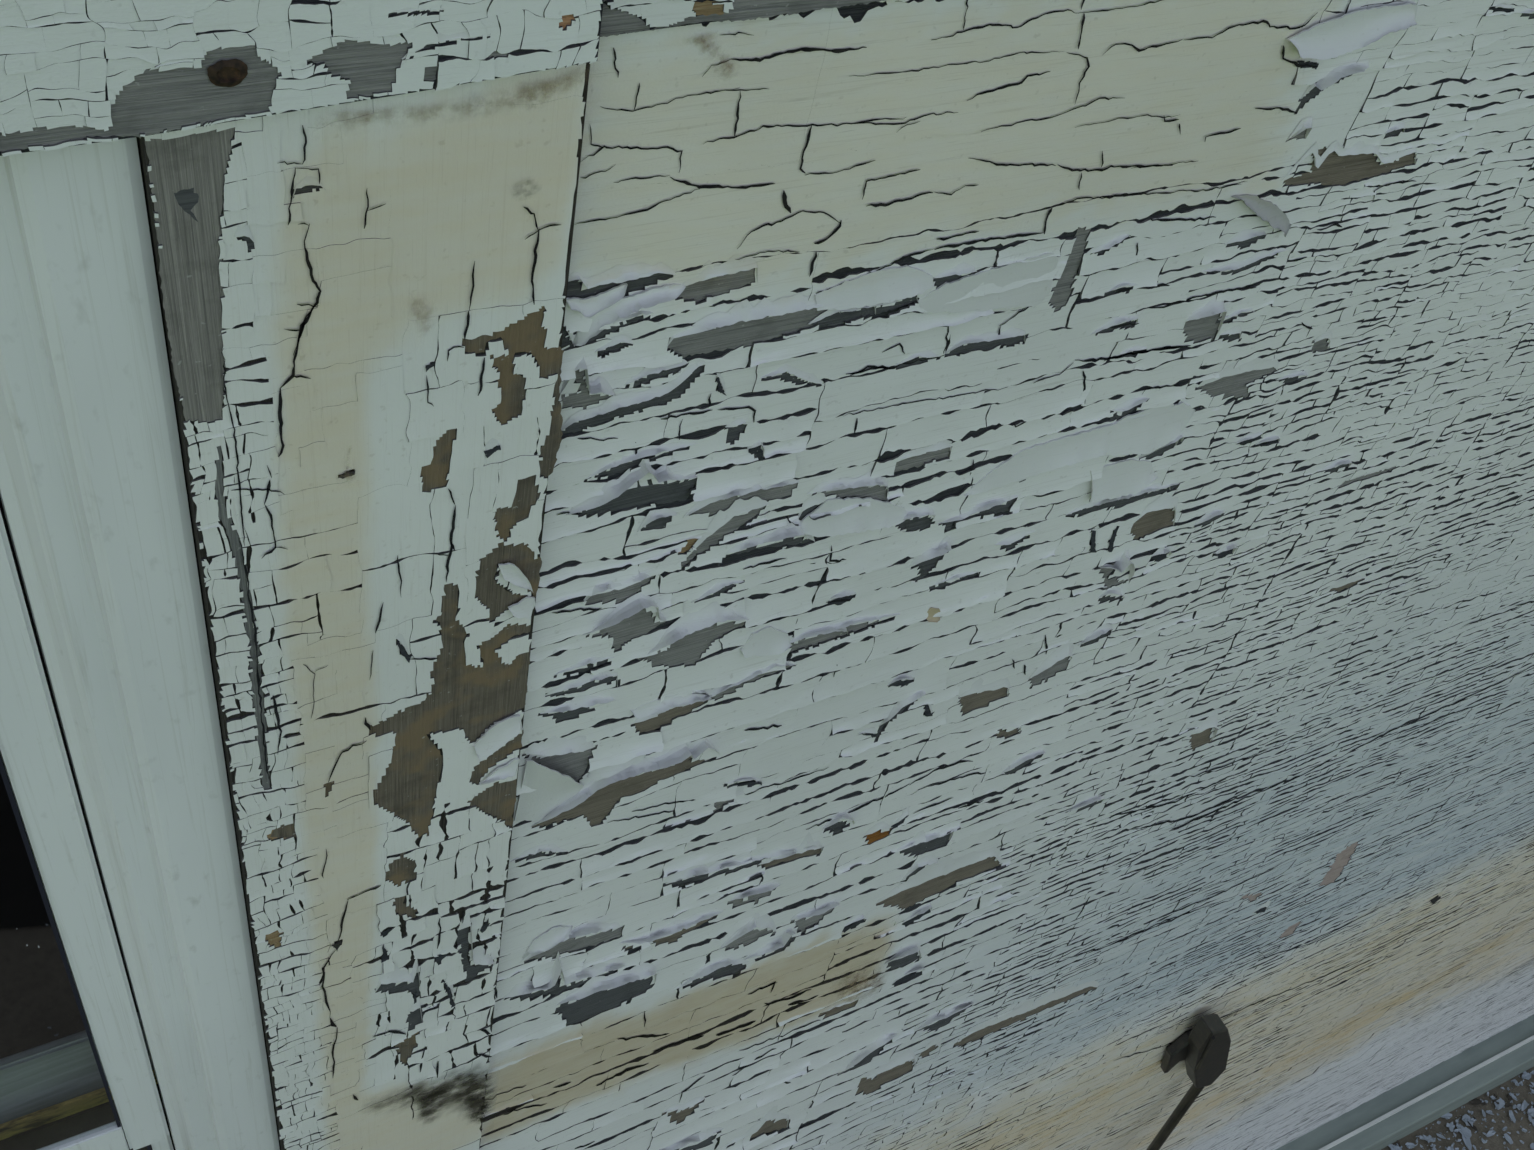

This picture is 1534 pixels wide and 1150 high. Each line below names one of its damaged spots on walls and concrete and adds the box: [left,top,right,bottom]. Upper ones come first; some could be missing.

peeling [1282,2,1418,185]
peeling [0,45,281,424]
crack [426,261,485,405]
crack [524,0,1351,434]
crack [221,125,328,779]
crack [369,555,402,680]
crack [435,489,456,582]
peeling [369,227,1196,838]
crack [328,718,371,782]
peeling [375,852,495,1064]
peeling [501,810,1002,1026]
peeling [838,981,1099,1094]